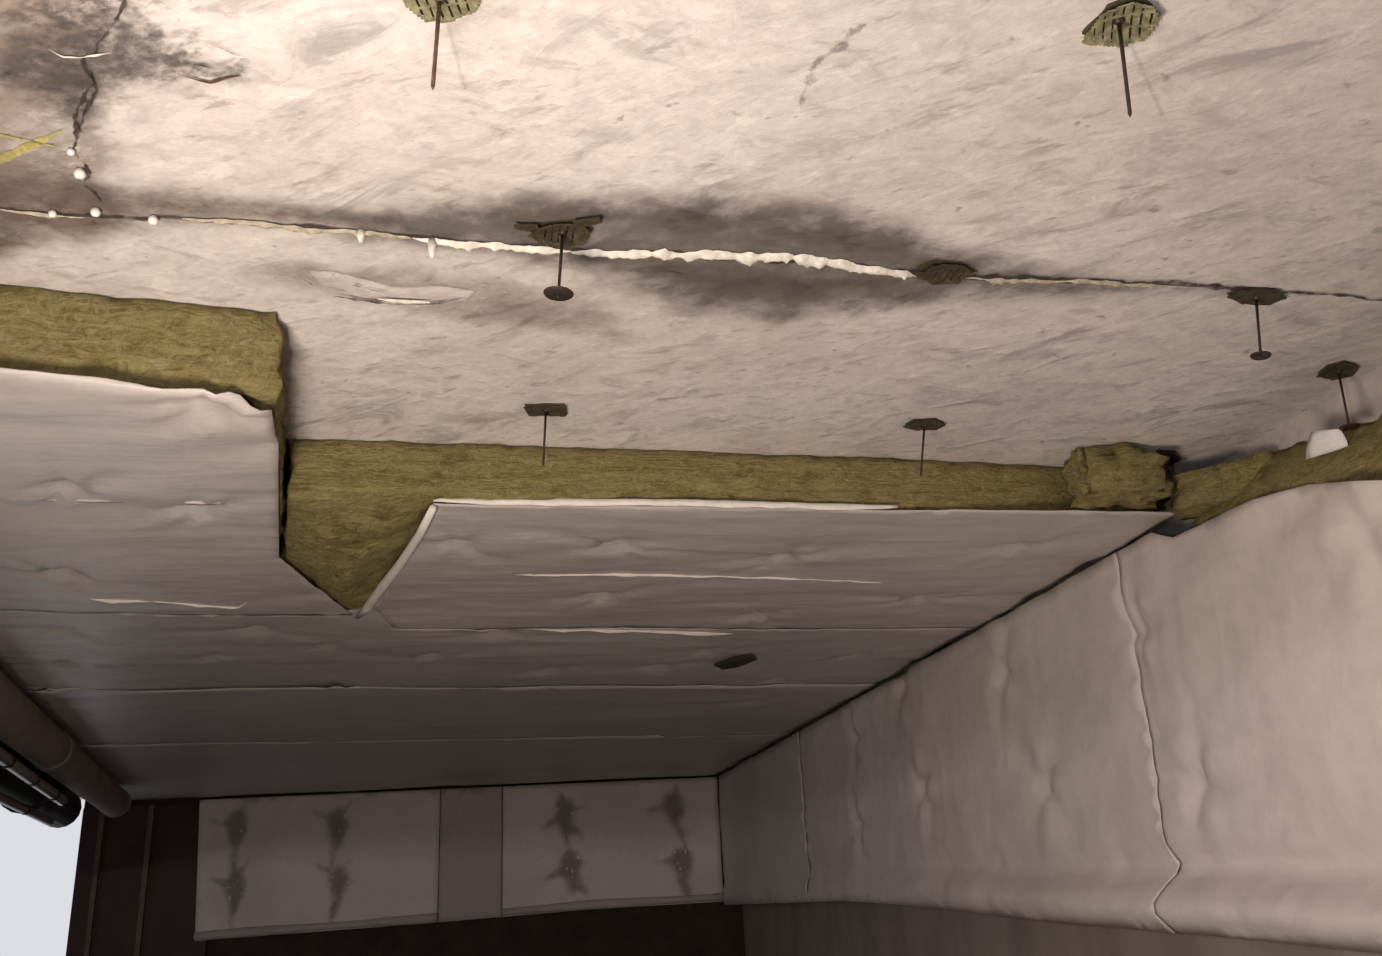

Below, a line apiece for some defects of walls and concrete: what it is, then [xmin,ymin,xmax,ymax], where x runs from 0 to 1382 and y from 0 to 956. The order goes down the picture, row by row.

leakage [0,0,313,250]
crack [0,2,922,280]
leakage [469,287,602,325]
leakage [338,199,1084,319]
crack [958,274,1382,301]